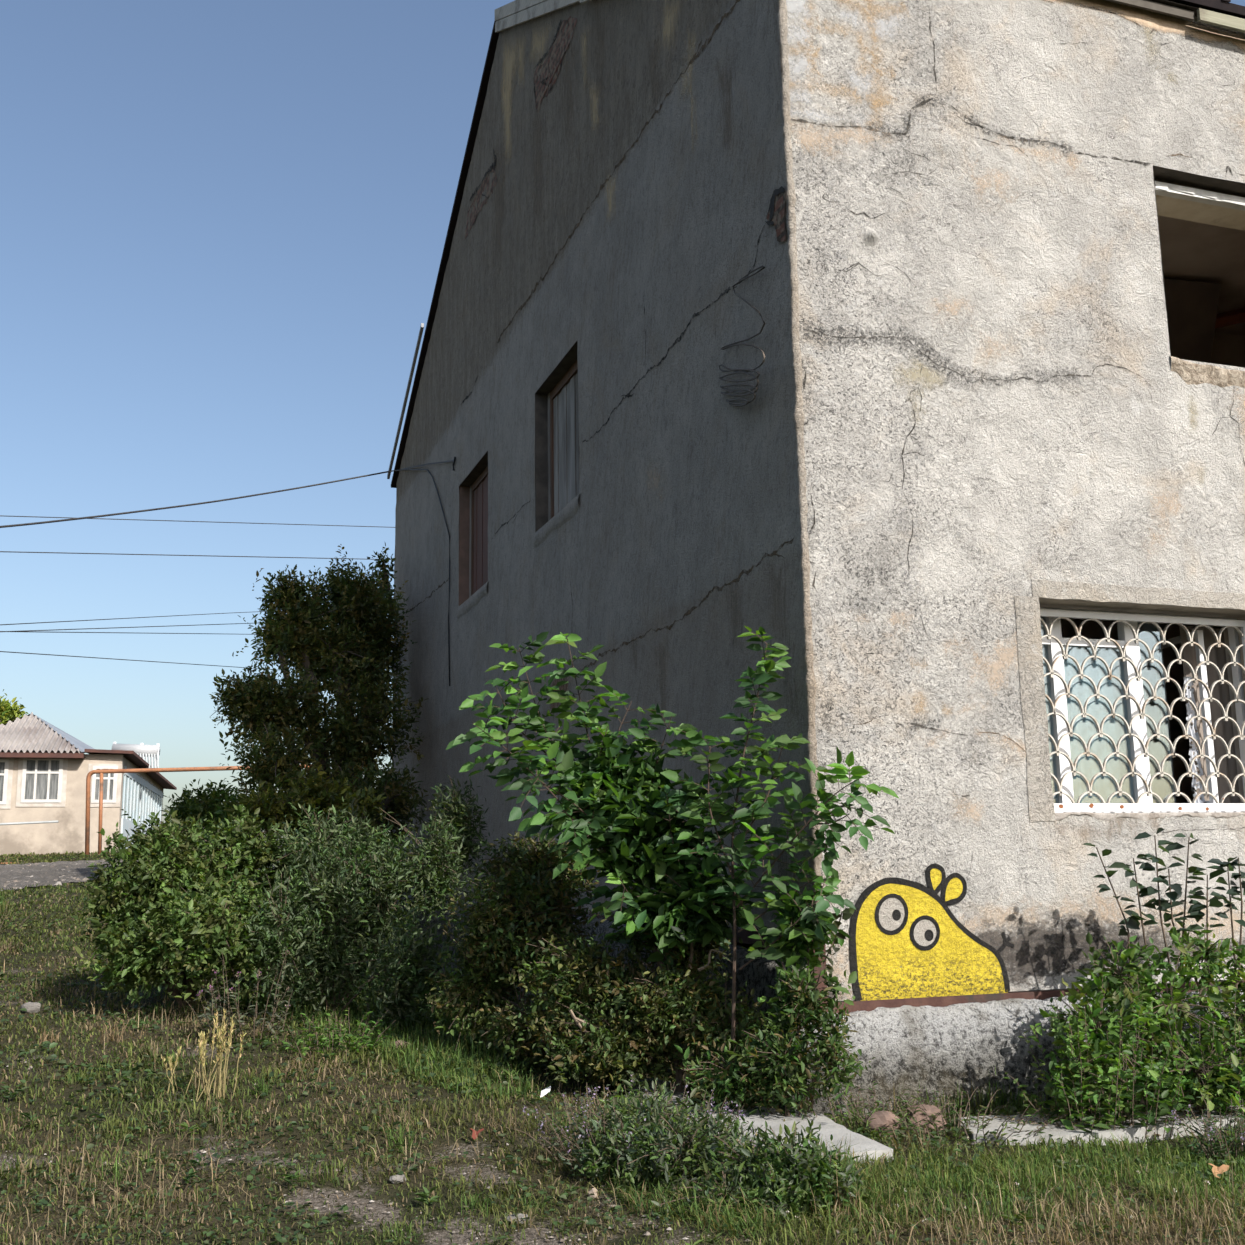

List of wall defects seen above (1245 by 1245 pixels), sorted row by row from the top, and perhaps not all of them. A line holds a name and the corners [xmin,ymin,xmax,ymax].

flaking render [534,16,577,112]
crack [497,0,740,343]
flaking render [765,186,786,242]
crack [791,9,1192,219]
crack [582,225,768,443]
crack [805,323,1152,642]
crack [573,536,795,671]
leakage [966,901,1245,986]